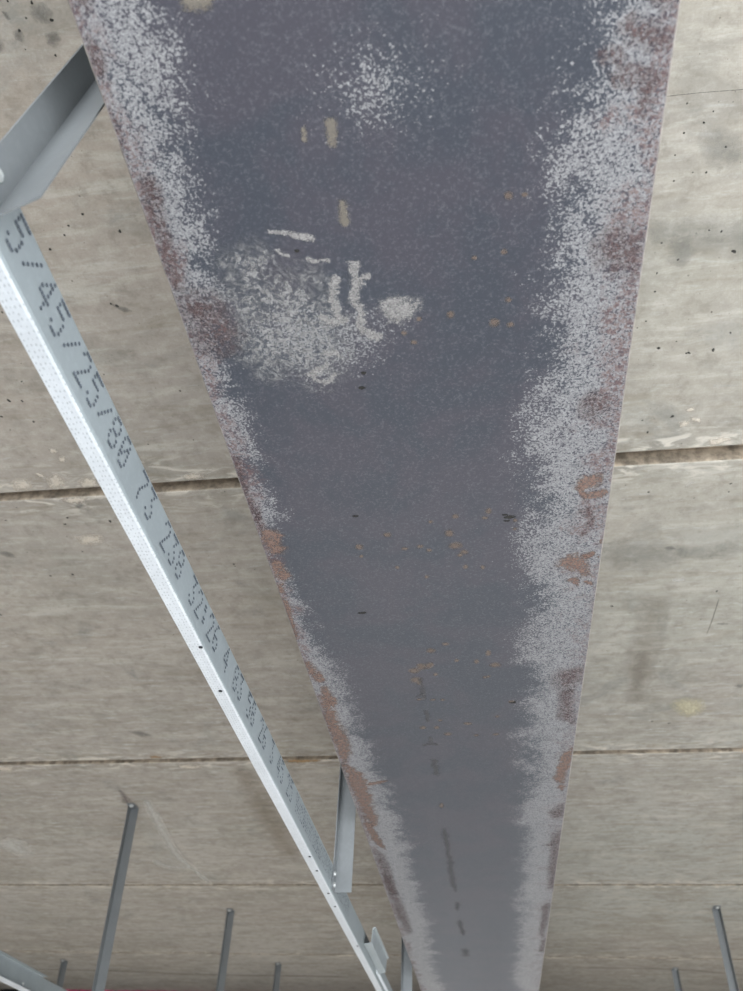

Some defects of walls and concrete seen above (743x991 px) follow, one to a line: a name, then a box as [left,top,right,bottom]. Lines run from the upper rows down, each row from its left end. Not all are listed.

corrosion [625,18,672,49]
corrosion [599,49,661,117]
corrosion [593,230,642,276]
corrosion [575,473,608,536]
corrosion [556,539,602,586]
corrosion [553,748,573,790]
corrosion [305,661,411,933]